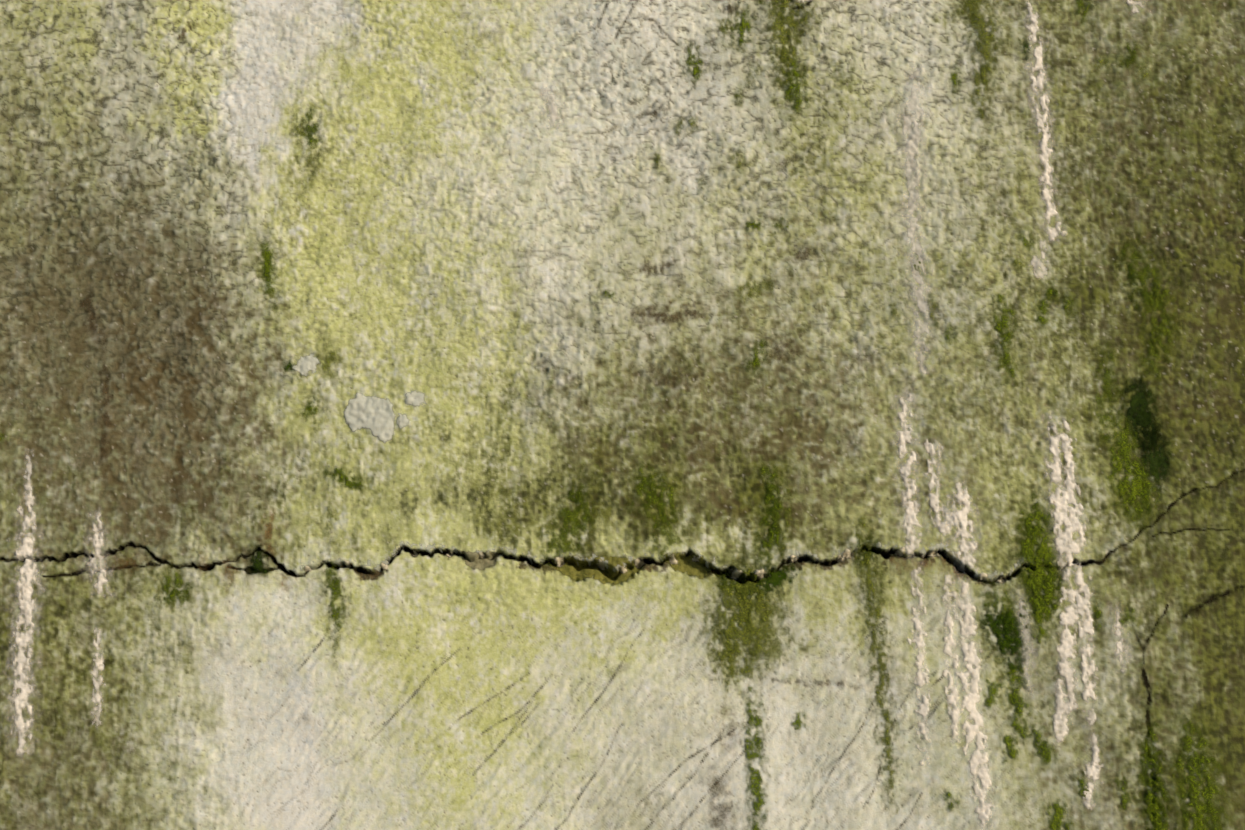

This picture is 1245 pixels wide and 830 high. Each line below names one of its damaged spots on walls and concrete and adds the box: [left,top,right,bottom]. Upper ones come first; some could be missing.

leakage [904,86,958,373]
leakage [1012,3,1073,324]
efflorescence [13,456,37,753]
efflorescence [91,630,104,723]
efflorescence [90,514,107,593]
crack [0,469,1245,586]
leakage [745,687,767,830]
leakage [899,394,1023,827]
leakage [1008,668,1031,739]
efflorescence [1047,416,1102,808]
leakage [1096,353,1159,521]
crack [1137,585,1245,830]